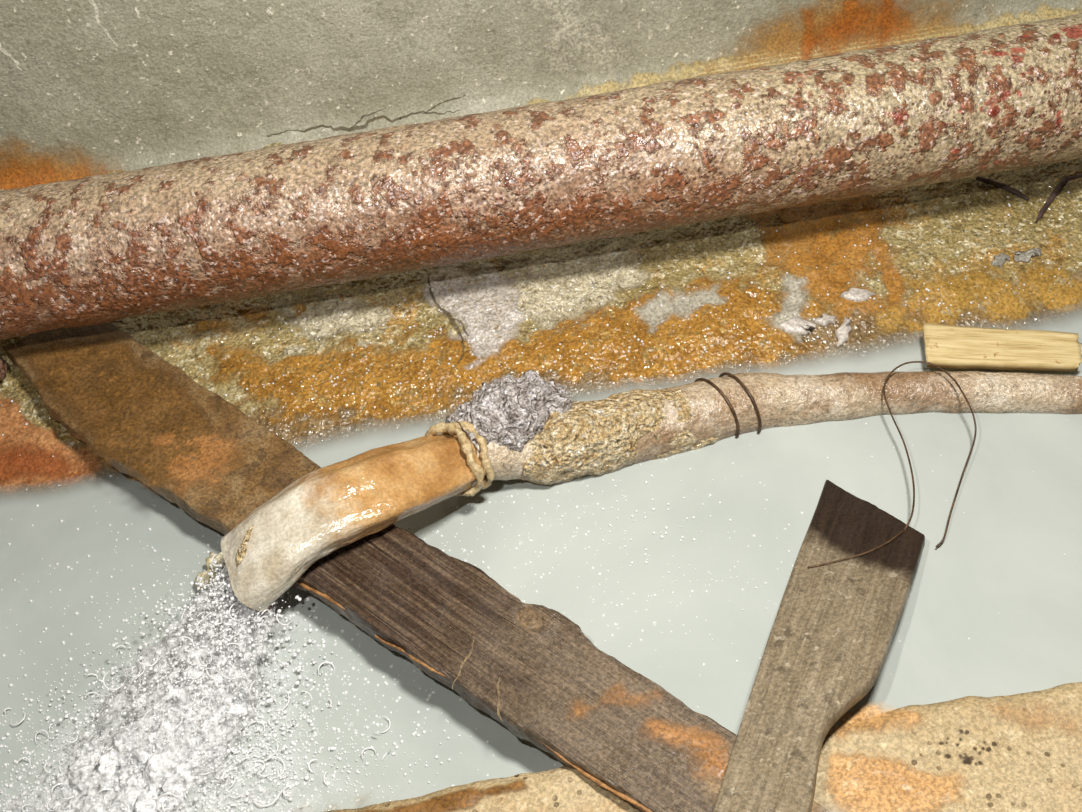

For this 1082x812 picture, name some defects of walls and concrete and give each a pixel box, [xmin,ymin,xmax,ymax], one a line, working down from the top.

leakage [526,0,1082,99]
rust [746,0,946,63]
crack [266,95,465,137]
rust [0,143,93,190]
leakage [424,262,523,365]
leakage [637,286,724,333]
leakage [772,276,807,339]
rust [0,398,101,494]